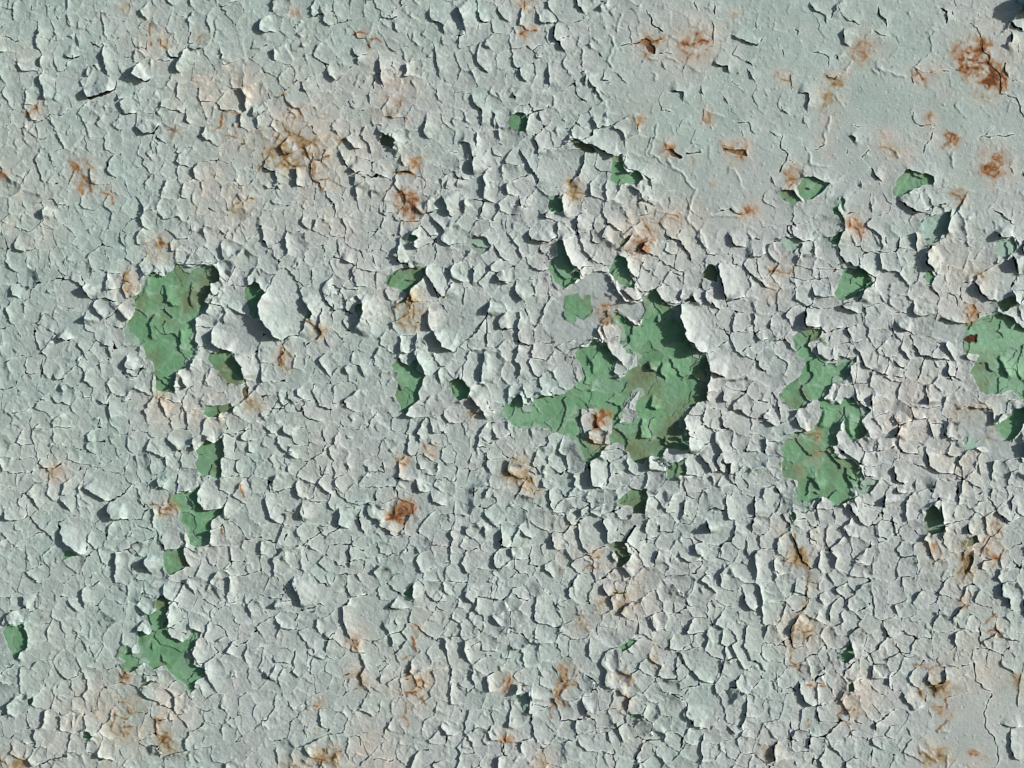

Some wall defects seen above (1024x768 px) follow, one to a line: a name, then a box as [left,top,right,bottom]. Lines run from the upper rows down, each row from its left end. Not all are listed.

corrosion [952,38,1009,97]
corrosion [256,115,330,191]
corrosion [981,153,1006,179]
crack [717,224,900,376]
peeling [371,123,1024,627]
corrosion [588,408,612,448]
peeling [30,221,489,768]
corrosion [385,495,417,524]
crack [551,507,636,556]
crack [925,451,1020,550]
crack [743,598,809,672]
crack [872,596,1021,763]